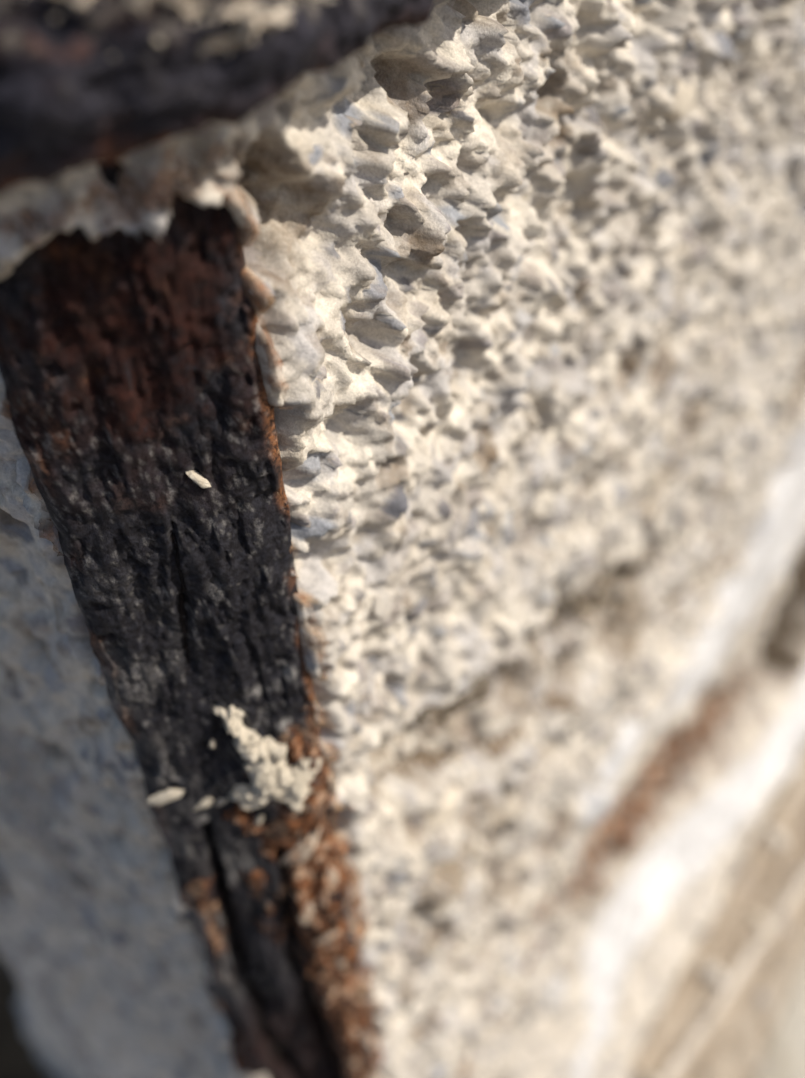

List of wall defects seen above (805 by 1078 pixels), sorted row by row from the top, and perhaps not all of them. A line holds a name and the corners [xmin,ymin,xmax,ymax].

corrosion [241,268,273,315]
spalling [234,0,805,1078]
spalling [0,374,237,1078]
corrosion [185,876,226,983]
corrosion [224,706,384,1078]